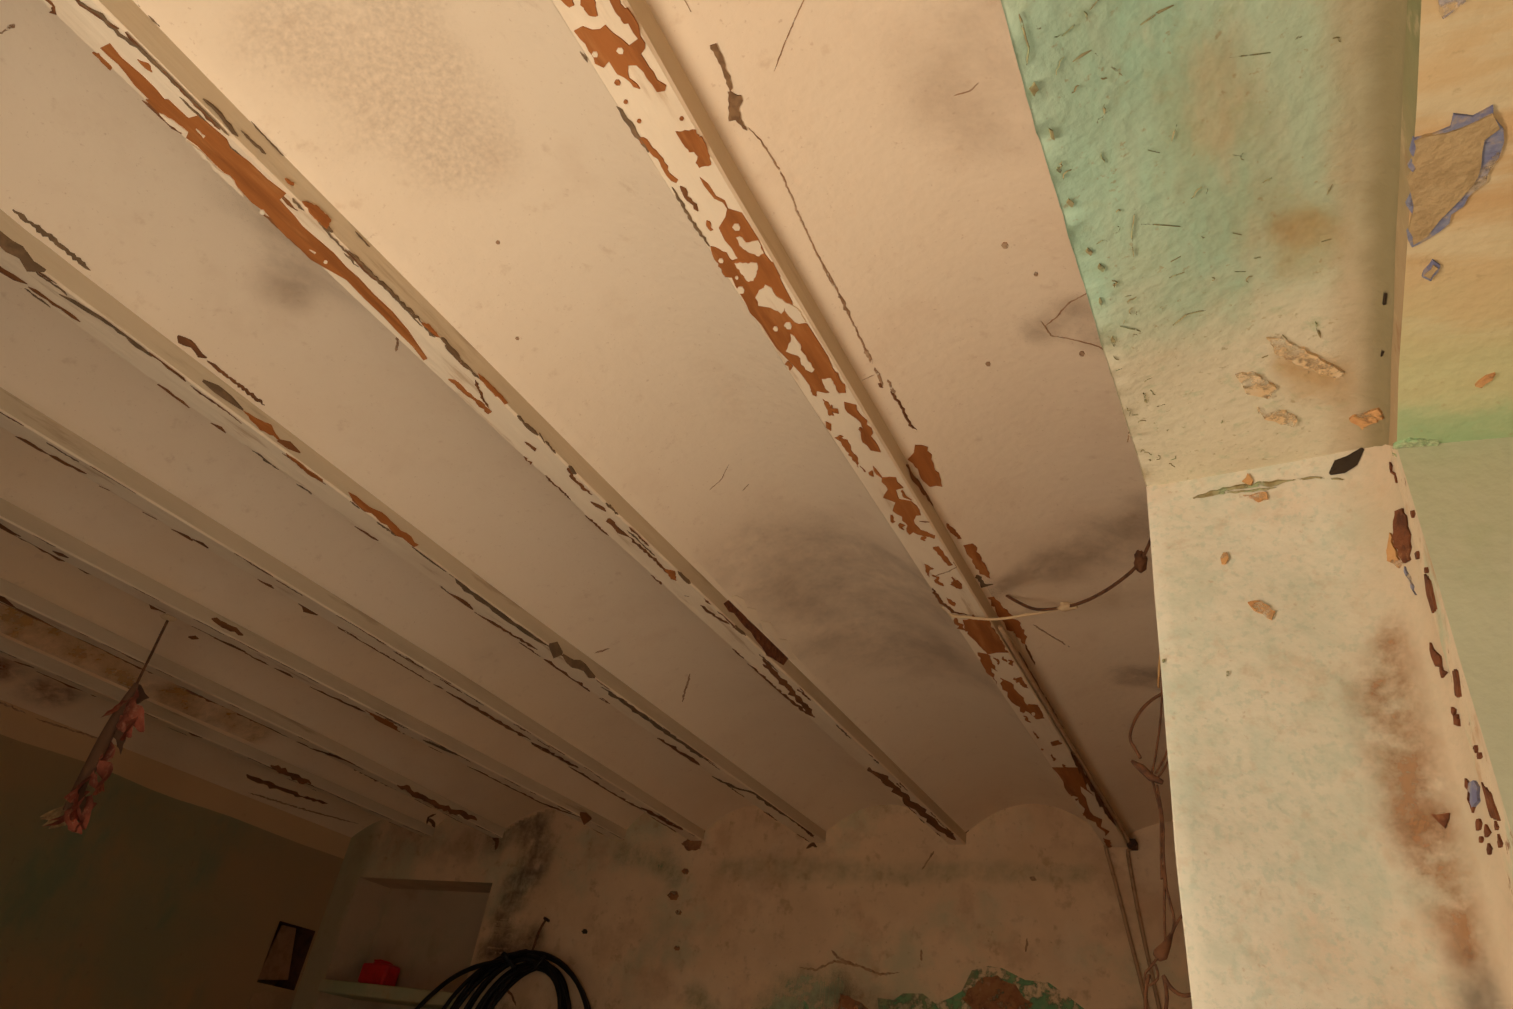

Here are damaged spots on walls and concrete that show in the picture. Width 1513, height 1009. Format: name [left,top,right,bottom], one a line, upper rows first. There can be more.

crack [774,0,804,71]
peeling [13,209,91,271]
crack [749,128,896,396]
peeling [1405,105,1504,247]
peeling [0,231,326,494]
peeling [75,0,814,734]
peeling [561,0,1116,848]
spalling [1386,508,1437,613]
peeling [348,492,809,842]
spalling [1429,642,1462,726]
spalling [1464,778,1503,855]
peeling [838,966,1084,1009]